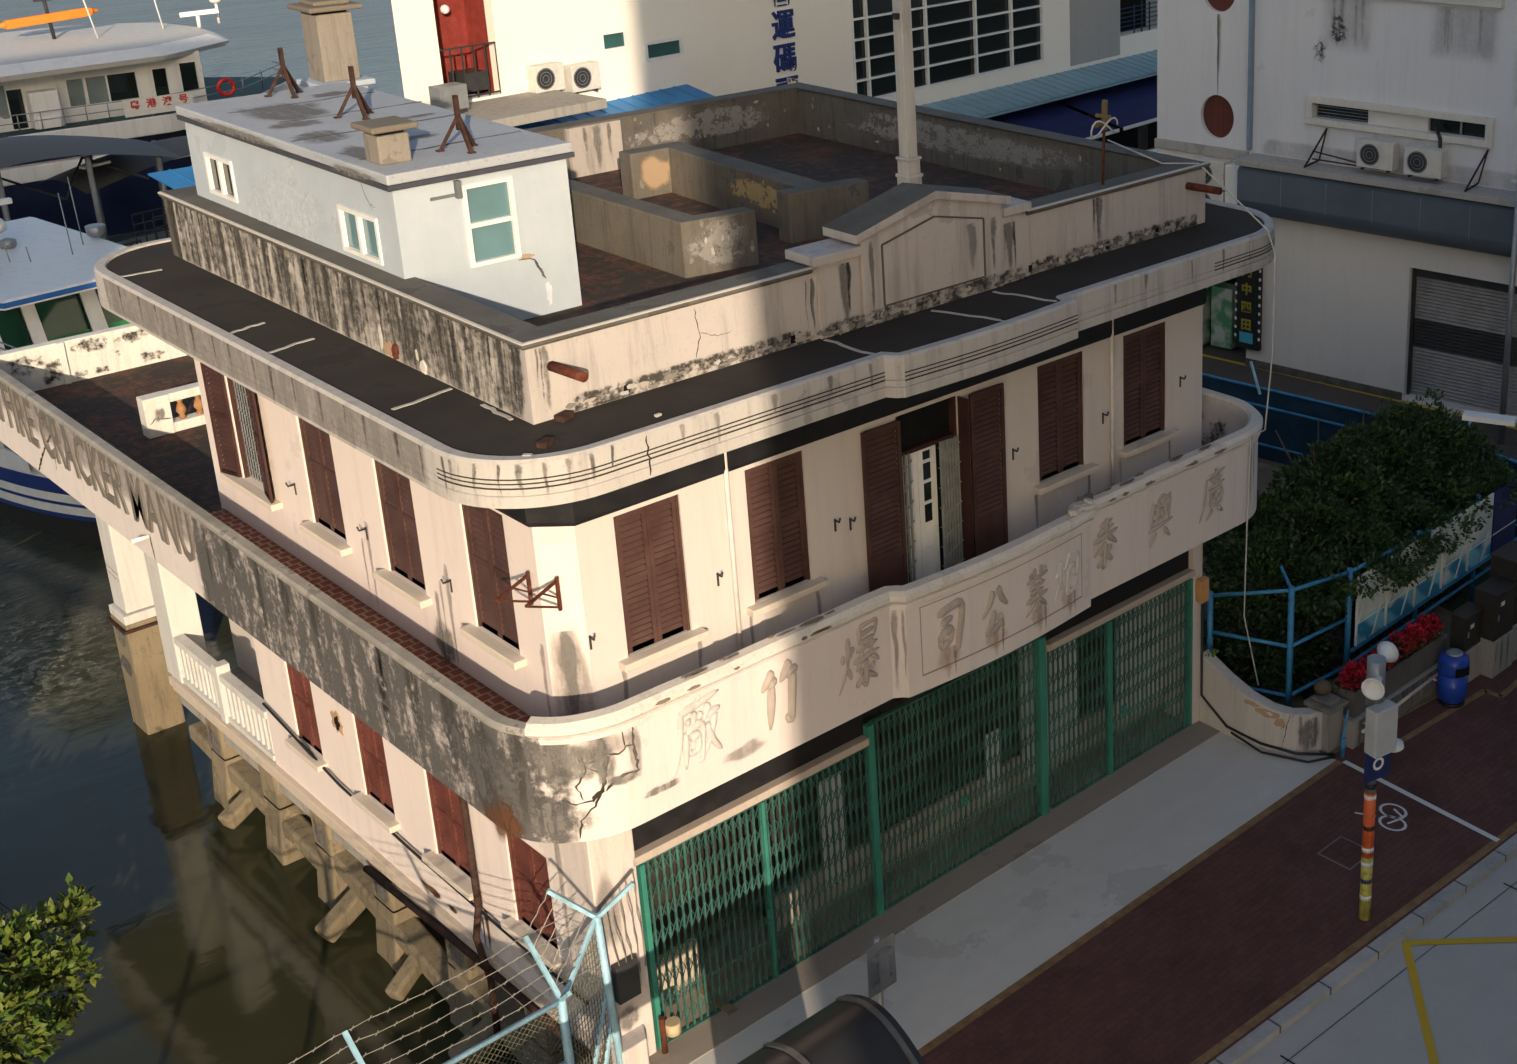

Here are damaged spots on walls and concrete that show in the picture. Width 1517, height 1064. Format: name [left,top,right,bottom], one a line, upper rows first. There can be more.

peeling [628,100,769,189]
peeling [729,178,778,214]
water stain [991,218,1016,266]
water stain [1093,198,1102,237]
water stain [167,200,550,420]
crack [694,309,732,358]
water stain [805,278,815,325]
water stain [839,262,851,320]
water stain [161,495,595,844]
crack [562,727,640,839]